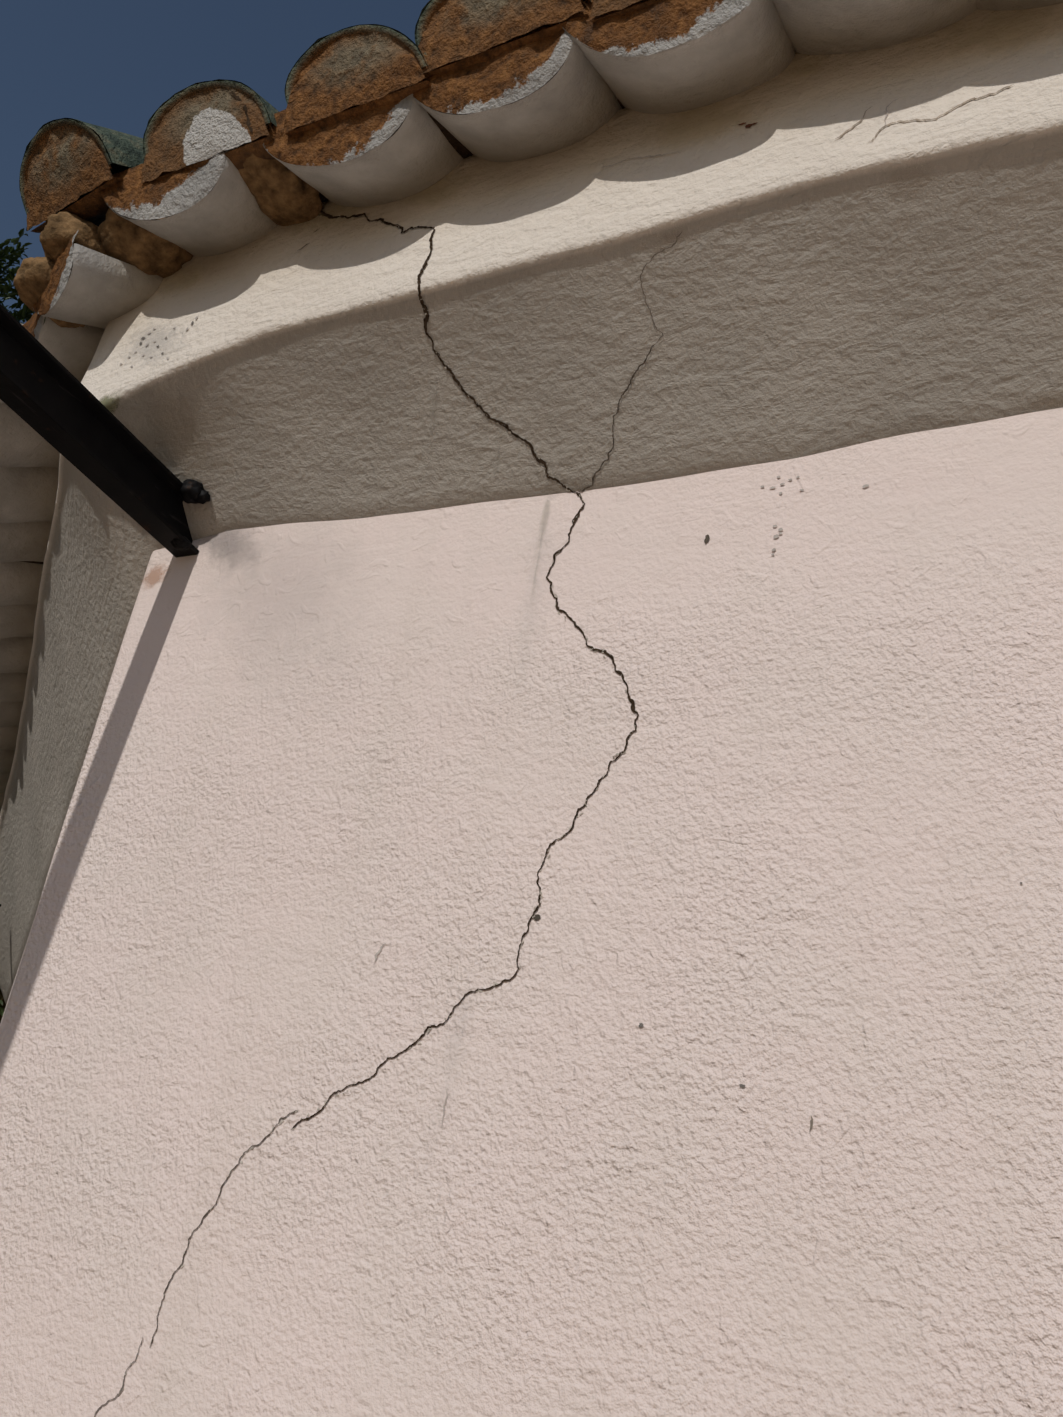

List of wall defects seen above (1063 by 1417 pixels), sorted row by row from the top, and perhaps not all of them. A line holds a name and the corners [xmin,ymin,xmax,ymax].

crack [837,84,1014,142]
crack [94,210,682,1417]